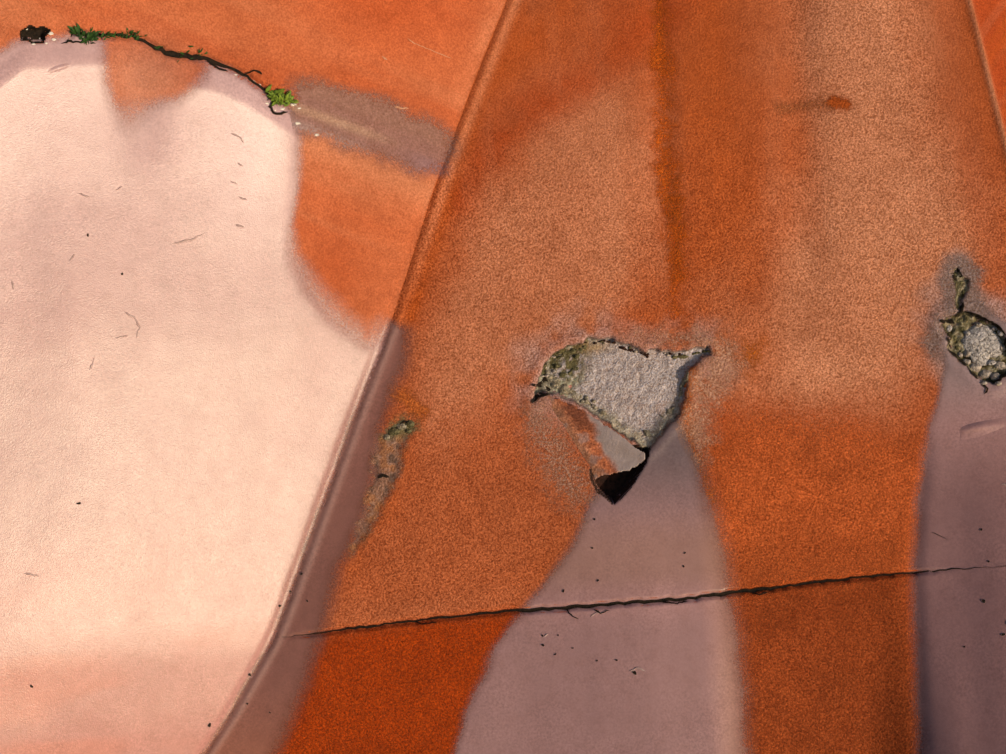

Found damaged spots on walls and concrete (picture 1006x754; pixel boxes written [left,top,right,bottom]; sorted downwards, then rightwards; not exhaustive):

crack [61,33,319,136]
damp [0,34,457,754]
spalling [531,337,710,505]
spalling [940,268,1006,394]
crack [291,566,1004,637]